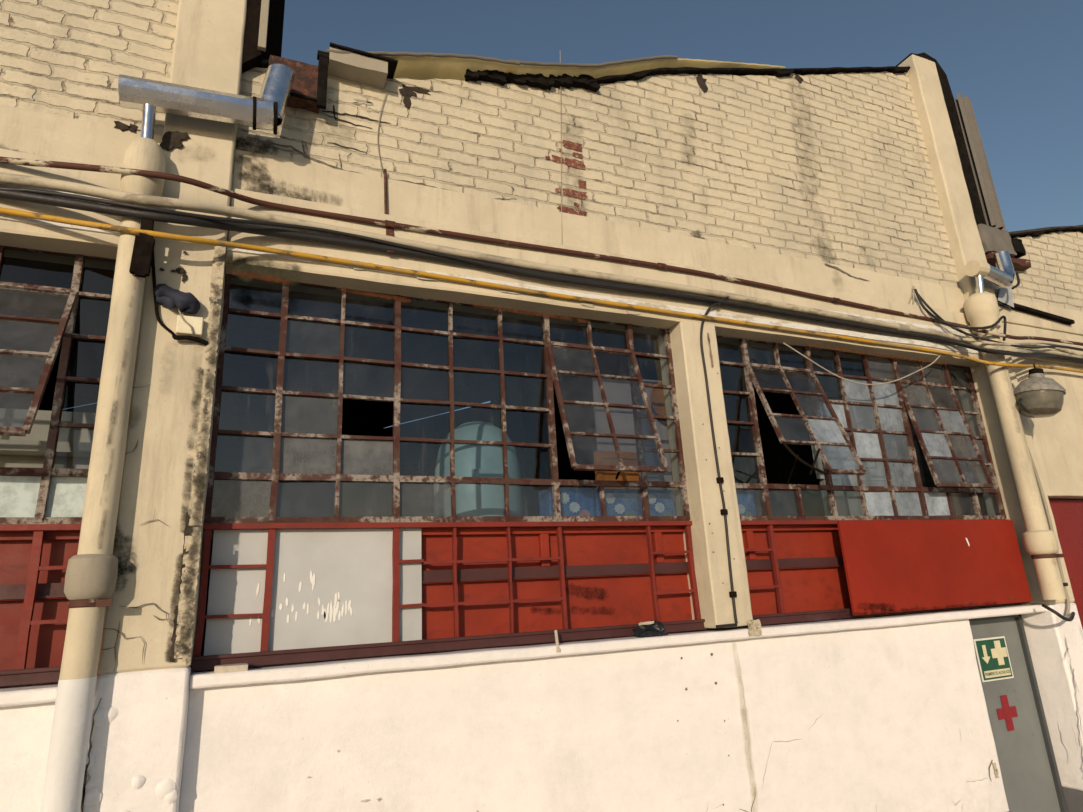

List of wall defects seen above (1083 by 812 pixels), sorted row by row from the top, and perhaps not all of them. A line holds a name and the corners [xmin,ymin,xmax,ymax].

spalling [696,73,708,93]
spalling [160,131,190,151]
damp [235,138,311,201]
crack [247,105,391,174]
crack [393,179,452,191]
flaking render [545,140,588,216]
damp [165,289,219,662]
crack [101,603,172,672]
crack [81,698,102,812]
crack [706,666,823,812]